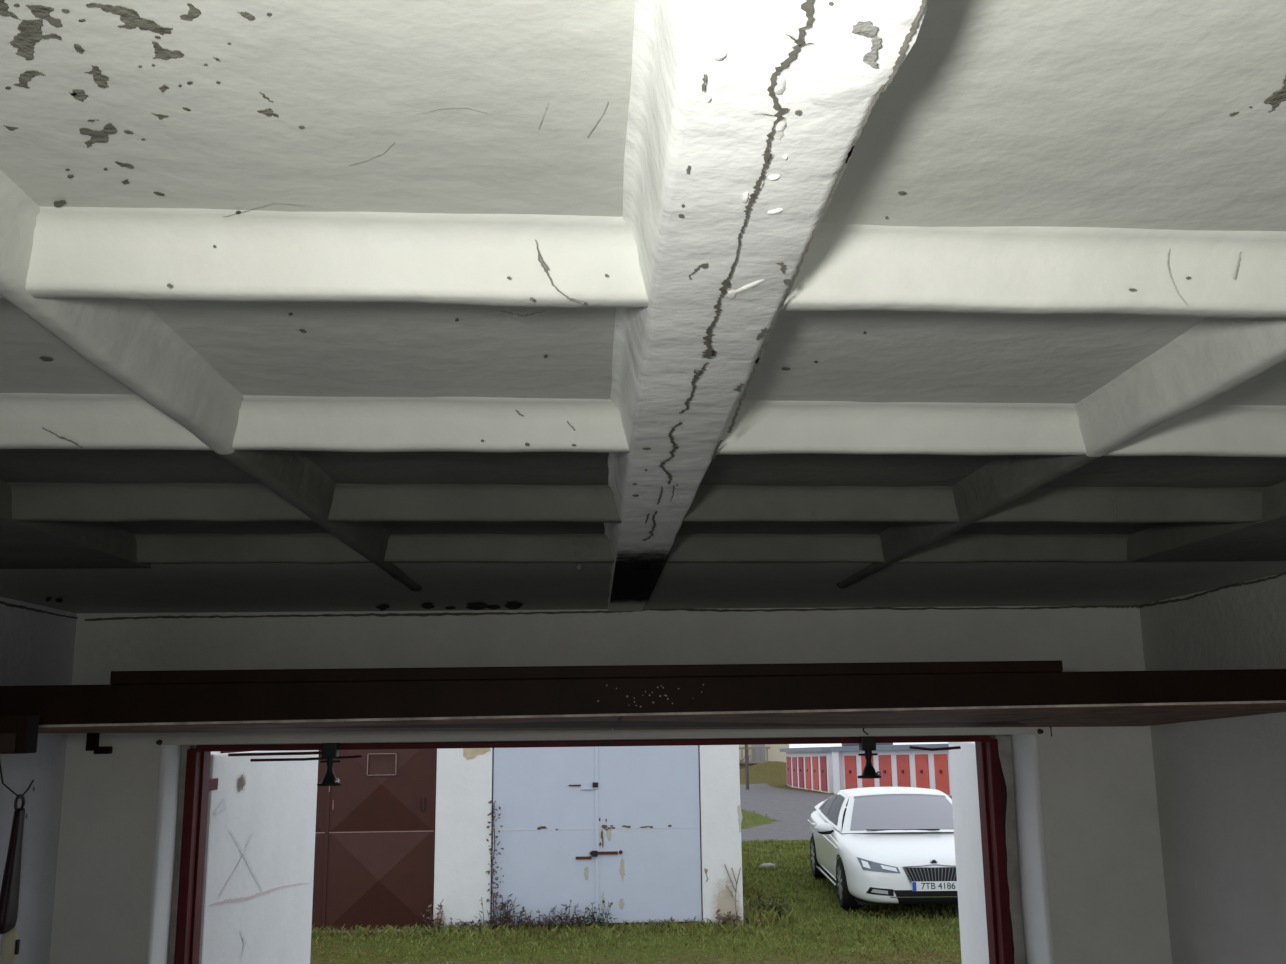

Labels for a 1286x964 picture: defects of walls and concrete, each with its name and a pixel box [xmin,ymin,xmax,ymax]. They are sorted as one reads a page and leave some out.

peeling [0,0,201,102]
spalling [852,20,881,68]
peeling [79,119,145,148]
peeling [257,92,278,117]
peeling [1230,76,1286,116]
crack [711,0,927,459]
crack [535,240,584,304]
crack [642,0,814,541]